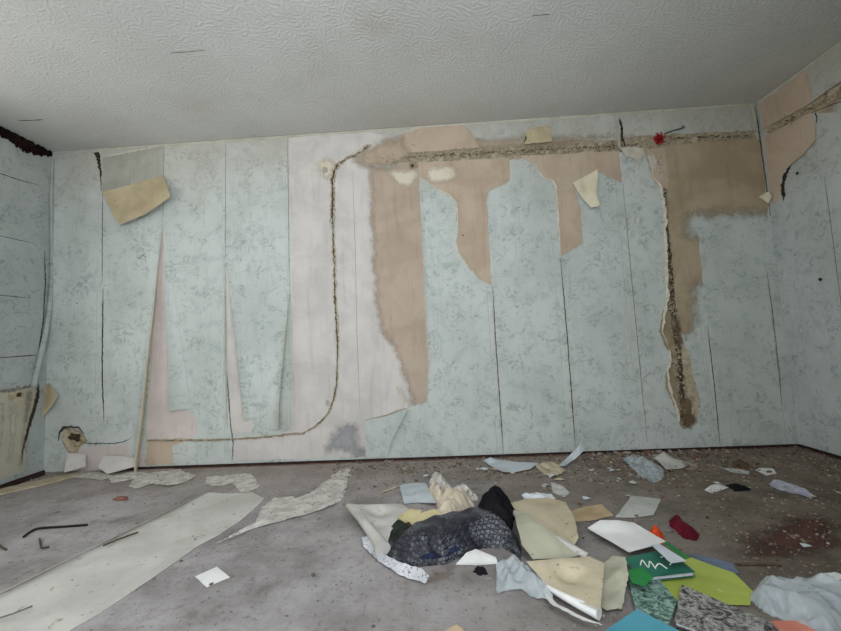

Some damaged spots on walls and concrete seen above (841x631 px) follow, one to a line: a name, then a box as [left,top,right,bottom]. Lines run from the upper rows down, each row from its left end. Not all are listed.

flaking render [58,227,197,471]
flaking render [102,146,164,194]
flaking render [225,123,635,461]
flaking render [644,108,816,423]